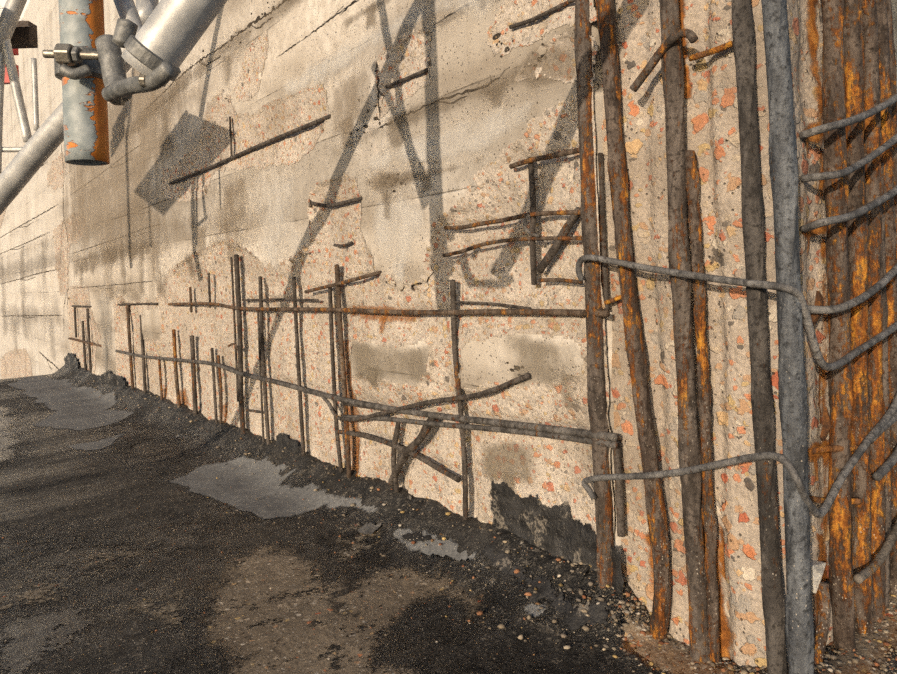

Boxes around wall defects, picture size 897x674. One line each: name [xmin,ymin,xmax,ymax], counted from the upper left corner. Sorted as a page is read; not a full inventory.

corrosion [678,0,691,98]
corrosion [805,0,824,158]
damp [74,91,170,259]
damp [403,141,433,160]
peeling [0,348,134,430]
spalling [52,212,101,374]
damp [352,344,423,386]
spalling [97,0,897,589]
damp [520,340,551,375]
corrosion [716,526,732,661]
spalling [615,421,897,674]
corrosion [817,513,830,591]